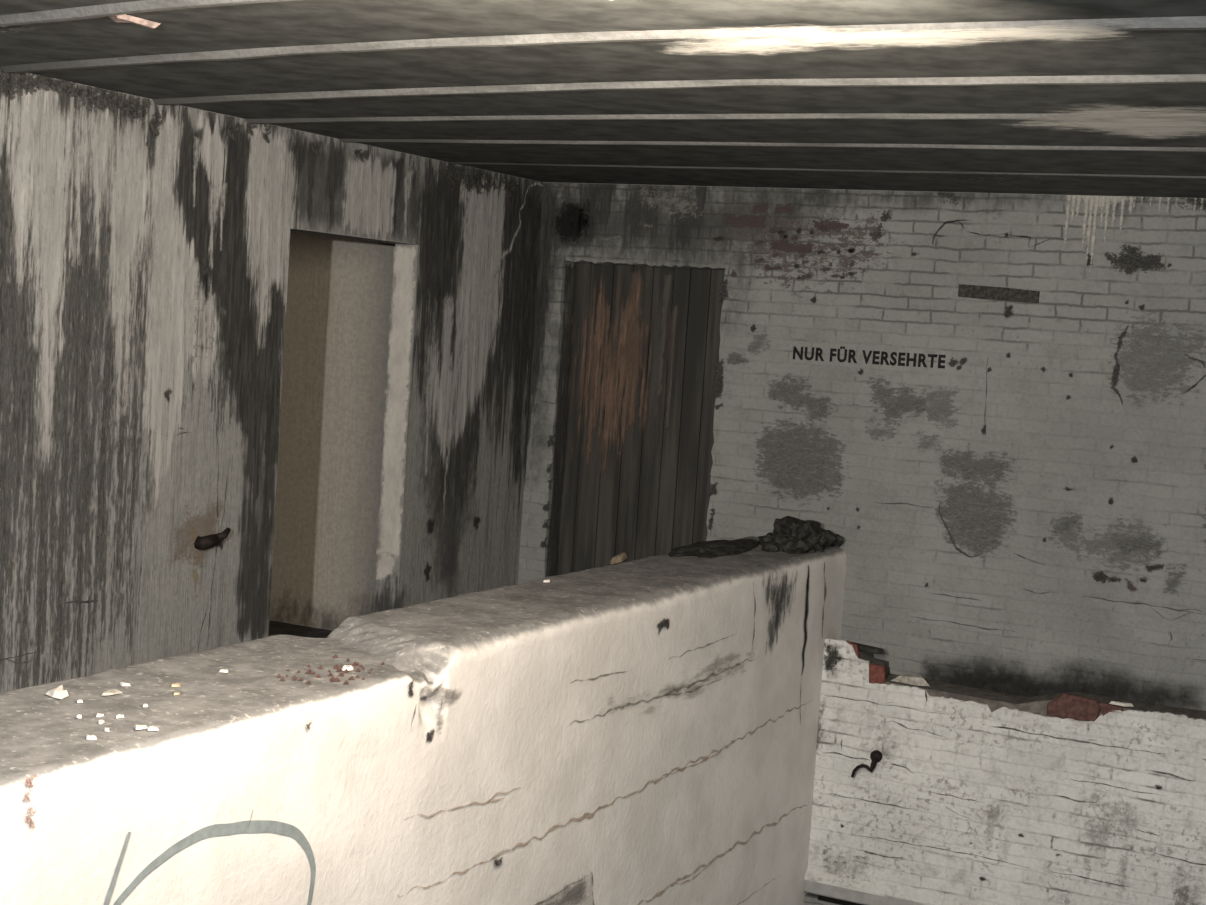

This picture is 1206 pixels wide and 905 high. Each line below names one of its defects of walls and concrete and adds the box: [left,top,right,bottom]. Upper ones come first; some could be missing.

leakage [0,73,556,683]
rust [569,275,660,472]
crack [397,562,978,905]
flaking render [847,641,886,684]
flaking render [1047,693,1123,721]